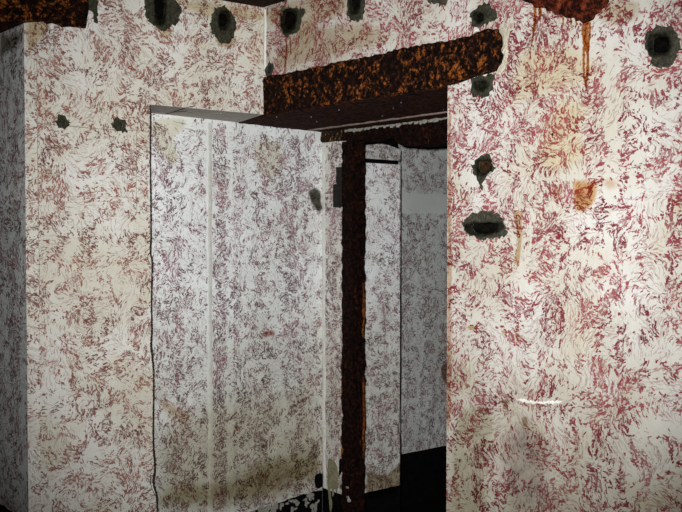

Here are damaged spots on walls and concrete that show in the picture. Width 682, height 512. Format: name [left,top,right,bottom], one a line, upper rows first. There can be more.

corrosion [562,16,591,89]
crack [71,104,158,512]
peeling [250,435,343,512]